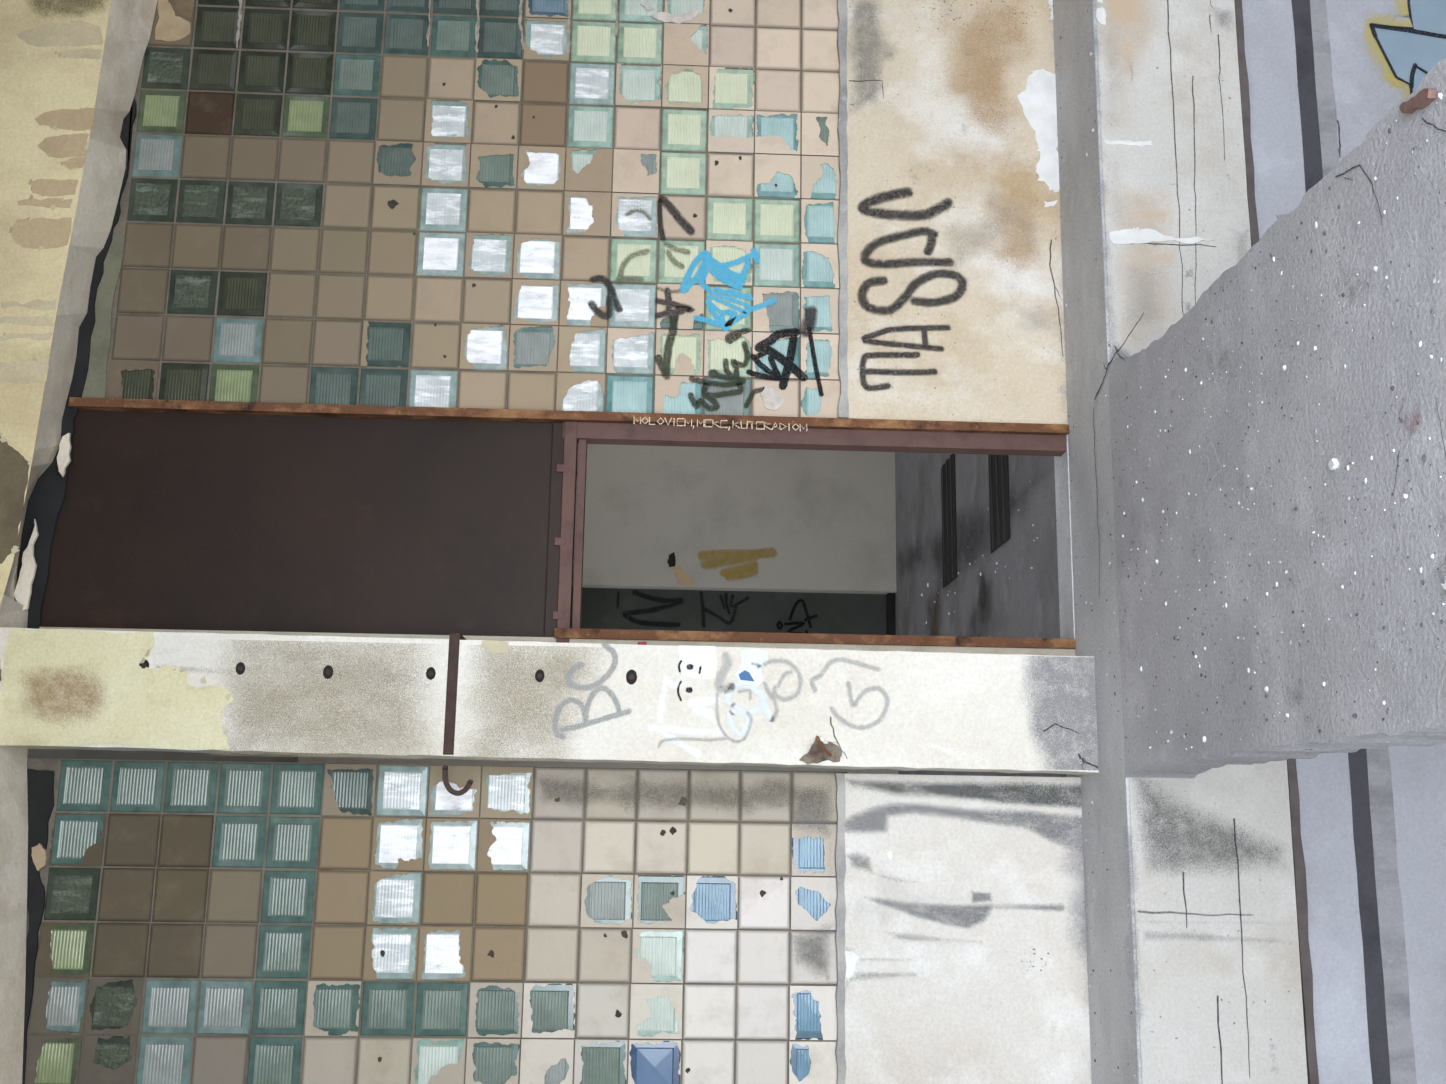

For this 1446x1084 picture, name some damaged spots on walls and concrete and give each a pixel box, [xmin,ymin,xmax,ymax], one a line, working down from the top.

water stain [846,0,1054,158]
peeling [1017,69,1060,207]
peeling [0,96,234,749]
spalling [22,769,54,1084]